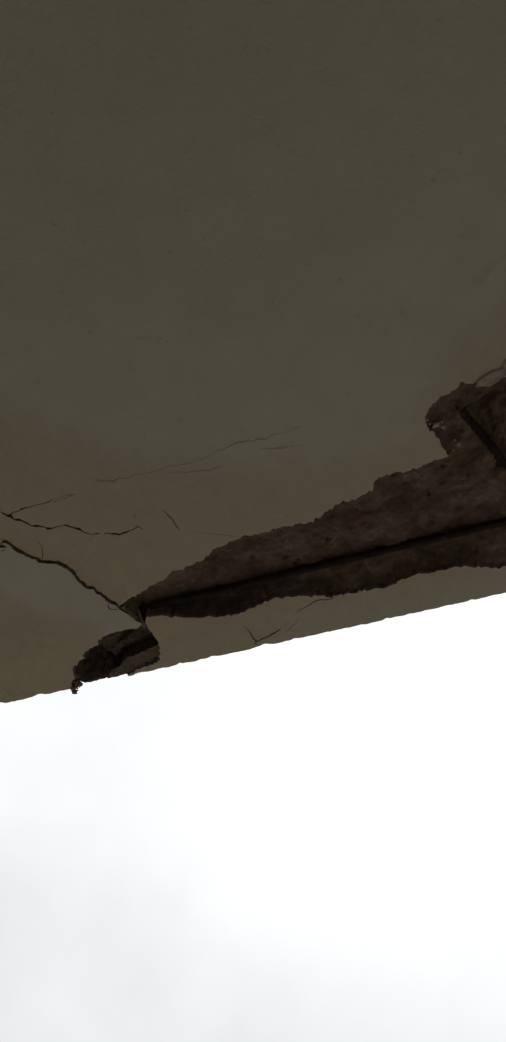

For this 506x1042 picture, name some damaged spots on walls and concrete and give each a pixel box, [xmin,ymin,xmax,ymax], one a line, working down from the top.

crack [0,494,142,610]
spalling [70,360,506,694]